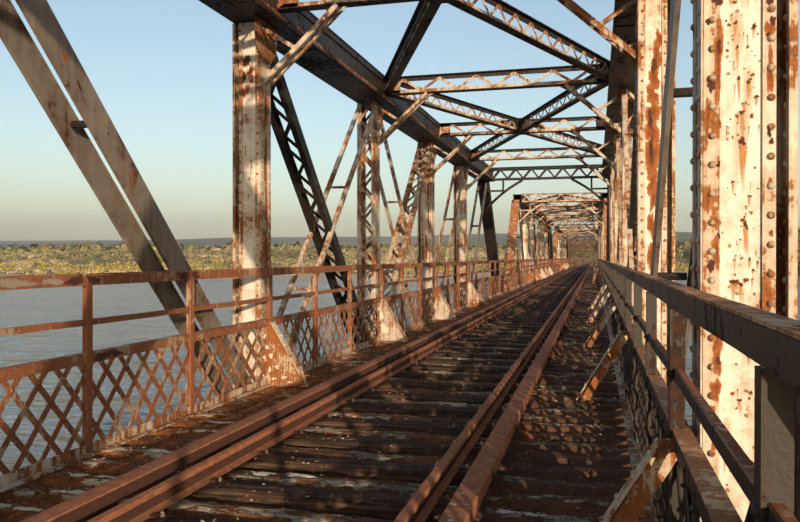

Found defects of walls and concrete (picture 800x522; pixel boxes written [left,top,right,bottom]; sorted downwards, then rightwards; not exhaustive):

corrosion [243,55,253,99]
corrosion [705,0,776,173]
corrosion [647,184,656,270]
corrosion [704,183,759,273]
corrosion [64,274,101,286]
corrosion [178,271,200,281]
corrosion [725,251,773,309]
corrosion [94,350,122,362]